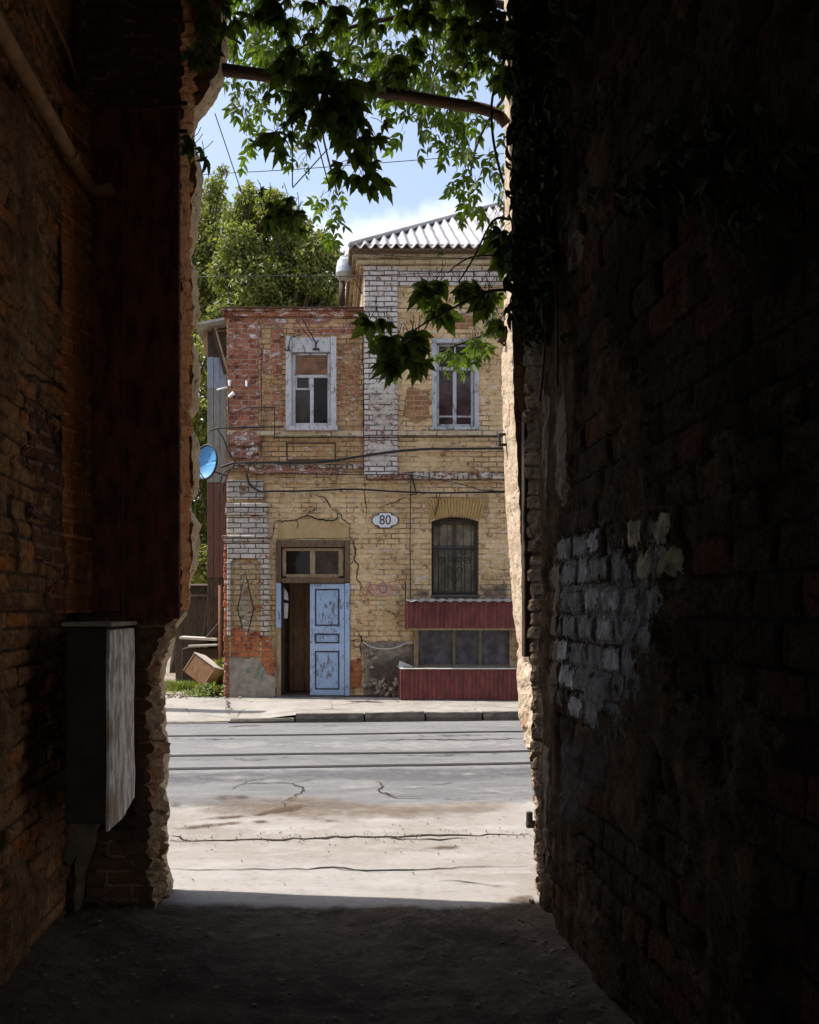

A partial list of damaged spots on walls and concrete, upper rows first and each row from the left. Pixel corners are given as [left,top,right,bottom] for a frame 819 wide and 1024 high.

peeling [226,317,431,474]
crack [272,311,410,591]
spalling [228,627,277,698]
peeling [553,507,684,752]
crack [170,833,528,841]
crack [249,864,519,872]